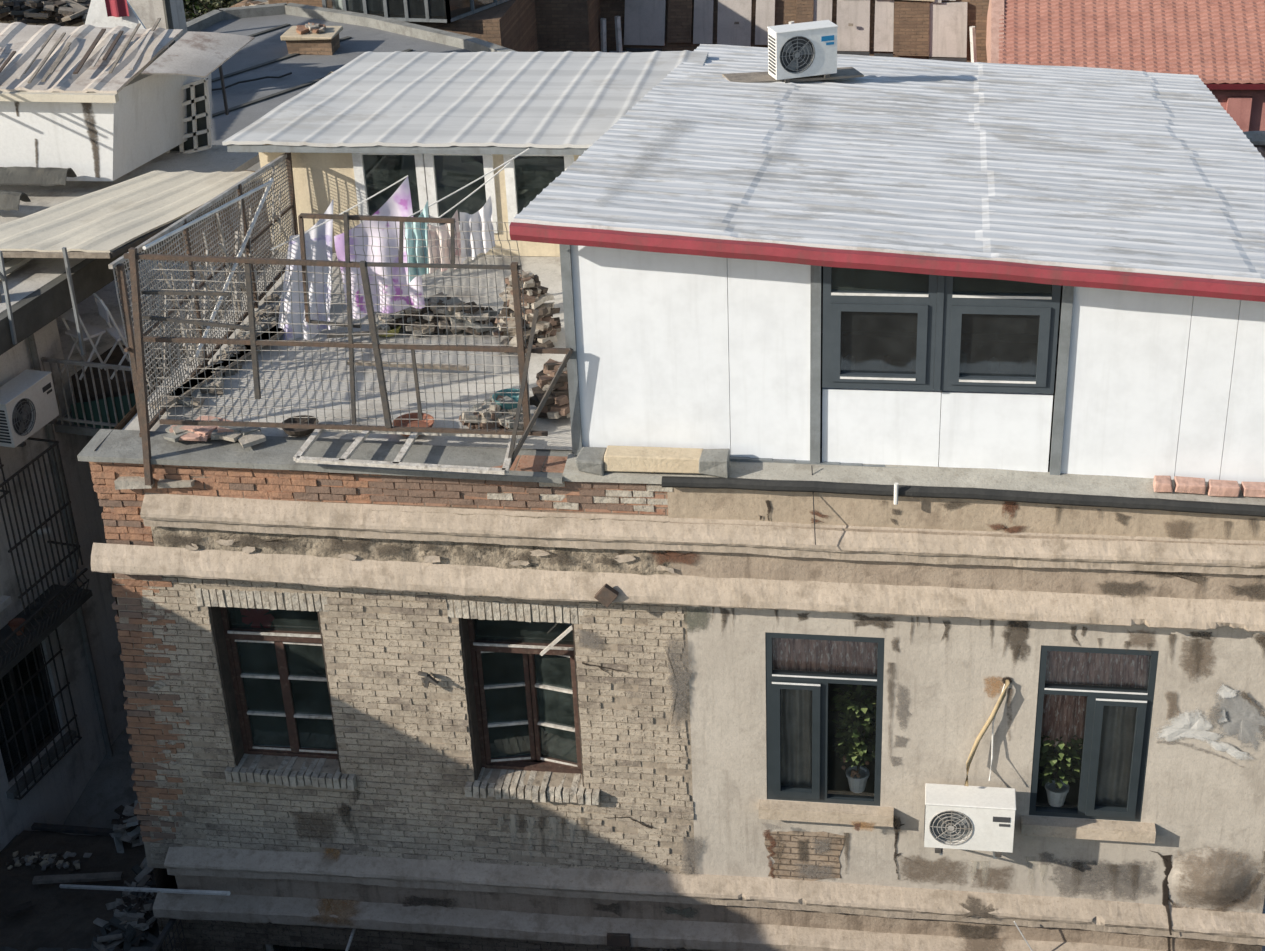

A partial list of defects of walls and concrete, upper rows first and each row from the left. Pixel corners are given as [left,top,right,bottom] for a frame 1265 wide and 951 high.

water stain [578,629,600,649]
water stain [666,607,734,721]
water stain [980,620,1030,663]
water stain [1125,631,1154,648]
water stain [1169,632,1212,676]
flaking render [111,573,190,843]
flaking render [1157,685,1265,760]
water stain [681,838,701,874]
peeling [763,823,849,881]
crack [1152,851,1174,951]
water stain [1179,850,1265,907]